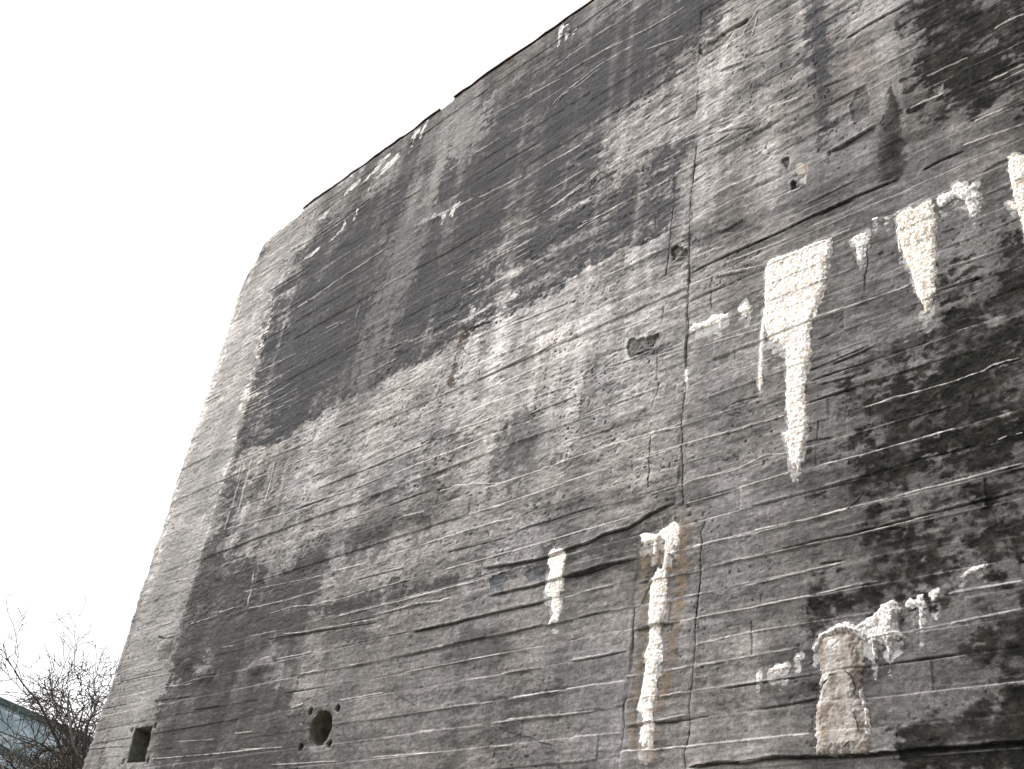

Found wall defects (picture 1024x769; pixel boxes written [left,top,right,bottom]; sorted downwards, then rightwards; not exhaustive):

damp [104,0,745,769]
spalling [627,334,659,358]
crack [665,147,899,495]
damp [689,154,1024,769]
crack [922,153,958,171]
crack [684,523,705,759]